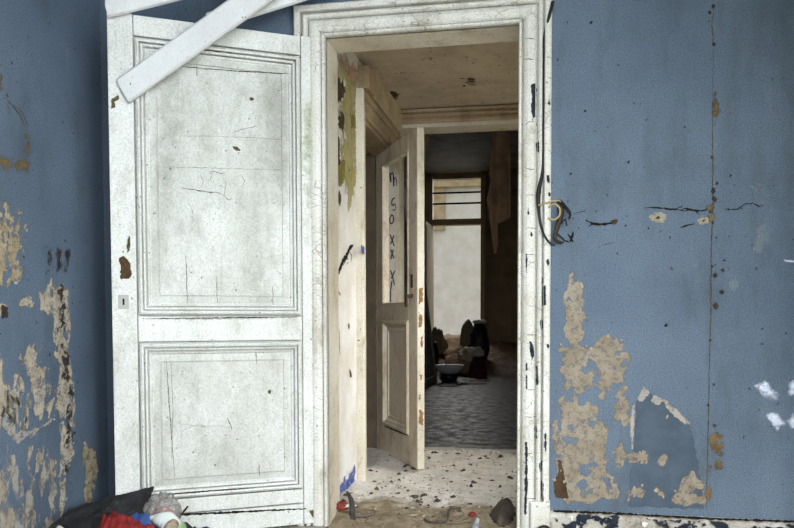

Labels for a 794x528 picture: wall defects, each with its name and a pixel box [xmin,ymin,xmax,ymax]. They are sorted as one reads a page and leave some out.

flaking render [338,78,347,165]
peeling [0,202,28,288]
flaking render [649,212,666,223]
crack [647,4,764,509]
peeling [0,278,99,528]
peeling [524,272,708,528]
peeling [642,518,729,528]